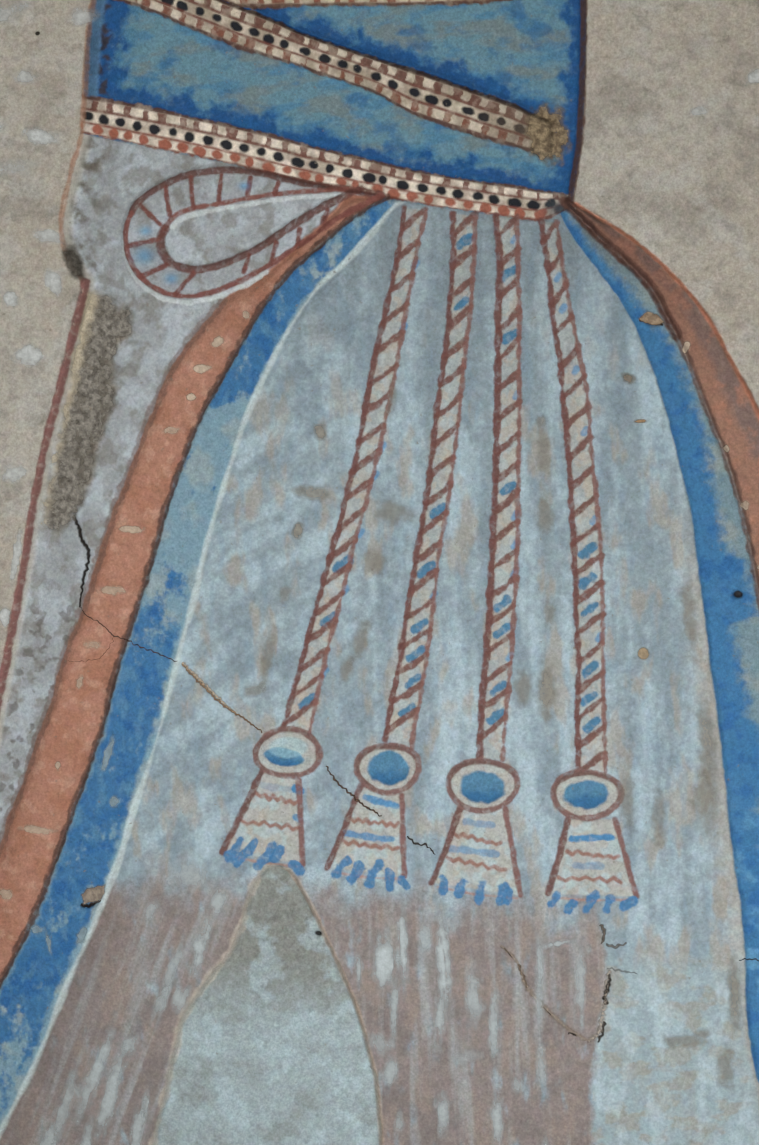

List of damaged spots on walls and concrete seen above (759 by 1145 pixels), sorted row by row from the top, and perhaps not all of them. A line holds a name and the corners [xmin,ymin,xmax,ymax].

spalling [526,104,569,161]
flaking render [44,294,132,530]
crack [72,516,262,733]
crack [326,766,382,817]
crack [407,836,434,854]
crack [504,924,627,1042]